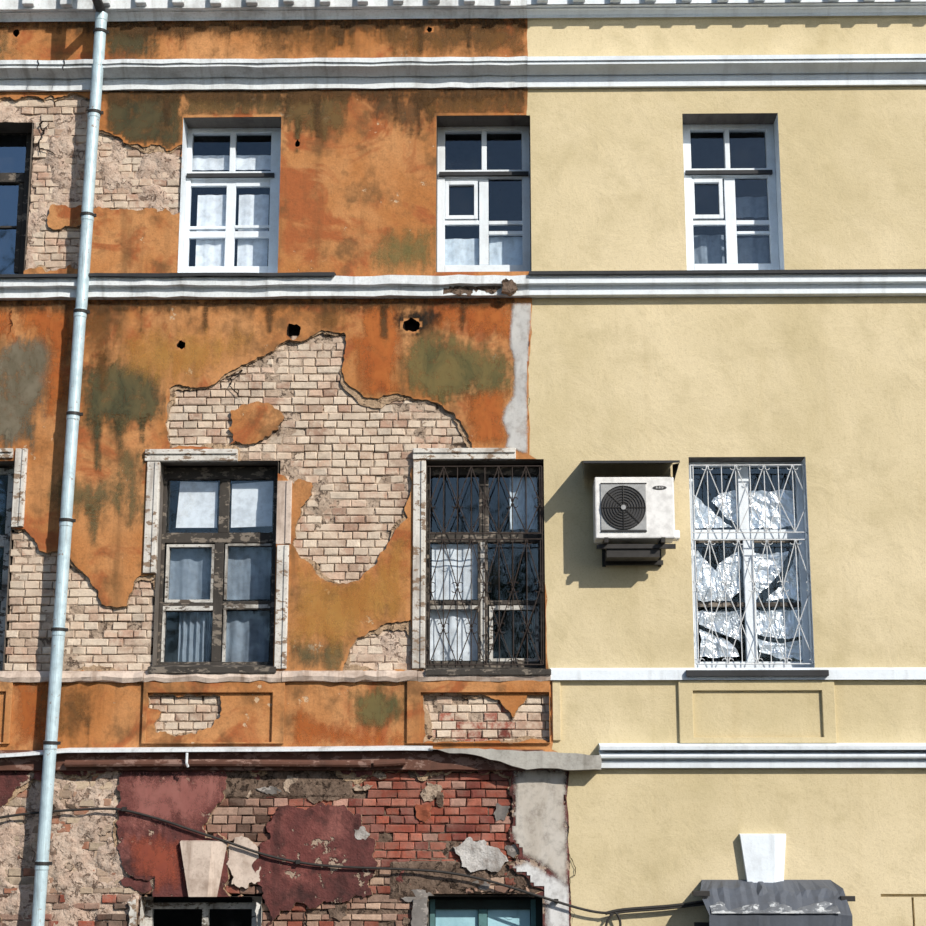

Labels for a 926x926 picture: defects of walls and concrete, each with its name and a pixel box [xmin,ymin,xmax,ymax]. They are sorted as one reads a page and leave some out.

spalling [0,93,90,272]
spalling [93,130,182,215]
leakage [73,420,144,540]
spalling [165,278,531,584]
spalling [4,527,58,671]
spalling [62,559,156,671]
spalling [343,620,412,670]
spalling [148,693,222,737]
spalling [423,693,552,744]
spalling [0,779,41,926]
spalling [44,770,569,926]